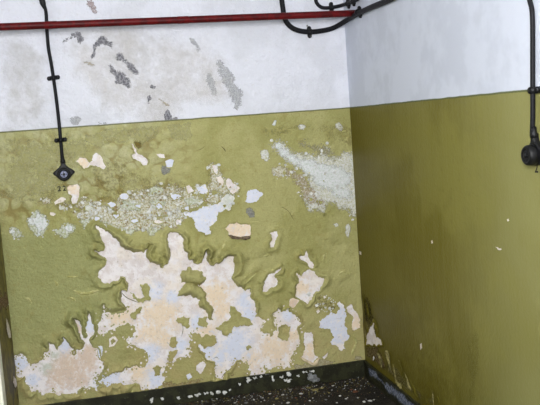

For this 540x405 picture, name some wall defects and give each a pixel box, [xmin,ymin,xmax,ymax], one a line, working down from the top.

peeling [75,152,108,171]
damp [260,139,356,238]
peeling [13,162,441,405]